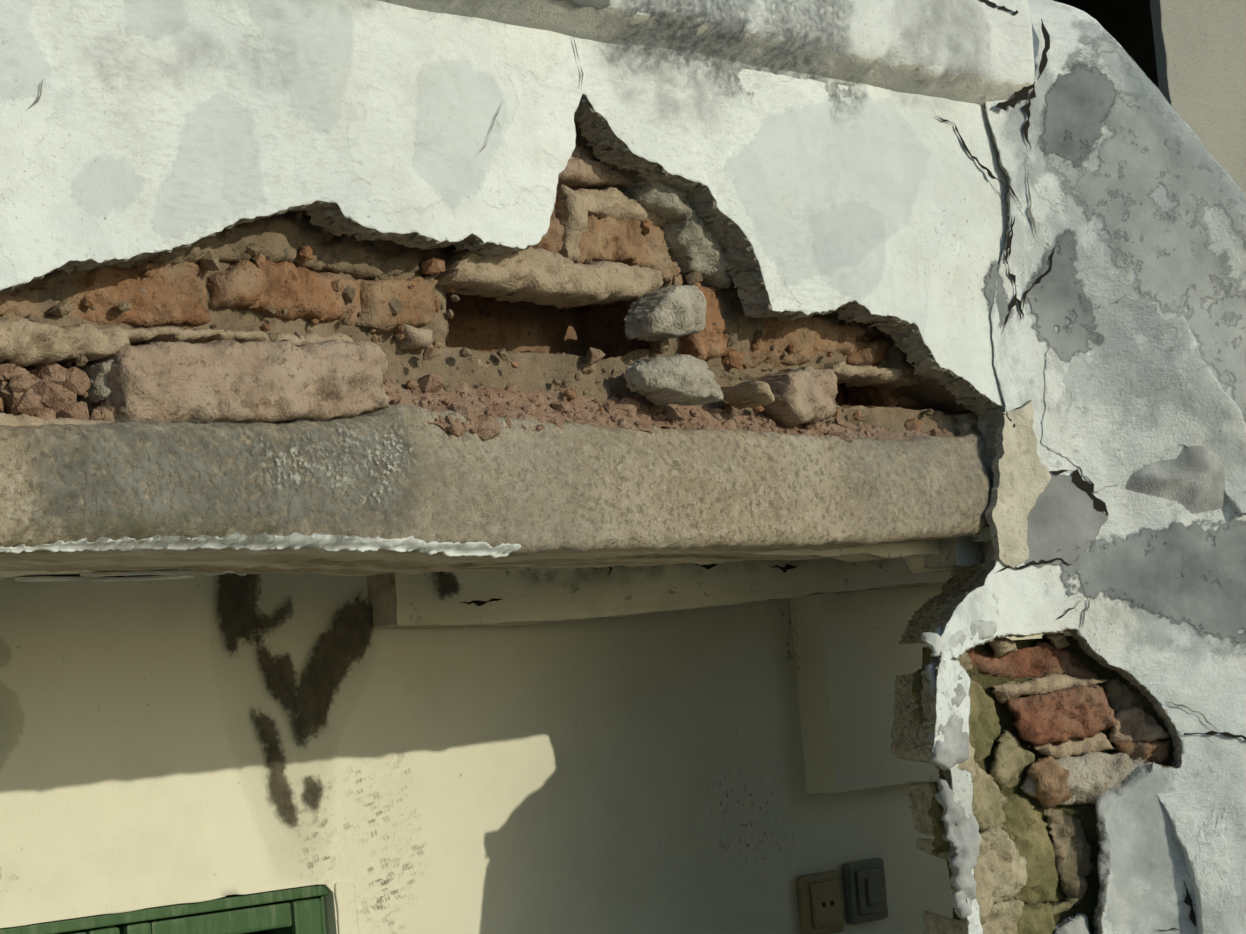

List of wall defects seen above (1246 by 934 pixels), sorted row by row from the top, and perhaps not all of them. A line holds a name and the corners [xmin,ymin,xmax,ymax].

peeling [557,0,610,10]
flaking render [0,119,975,435]
crack [936,0,1058,333]
peeling [982,261,1014,328]
peeling [1006,23,1246,422]
peeling [0,570,247,582]
peeling [985,400,1246,654]
leakage [256,598,305,746]
flaking render [910,647,934,726]
flaking render [927,633,1246,934]
crack [1169,702,1246,741]